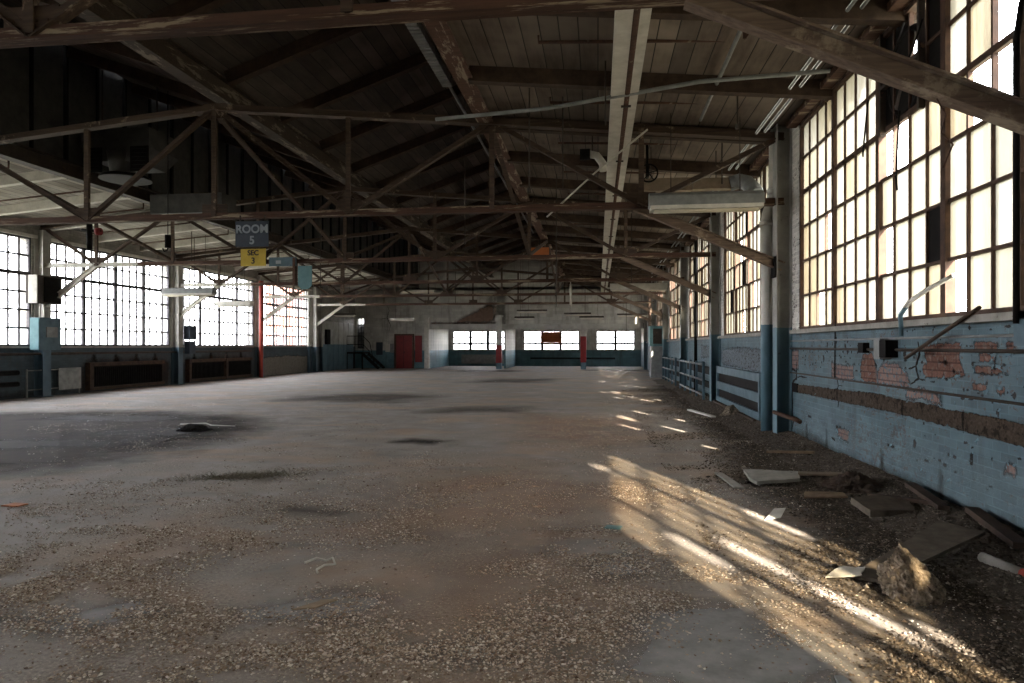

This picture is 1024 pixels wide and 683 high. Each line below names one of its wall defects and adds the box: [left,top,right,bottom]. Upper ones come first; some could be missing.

spalling [792,325,1024,482]
crack [908,342,925,384]